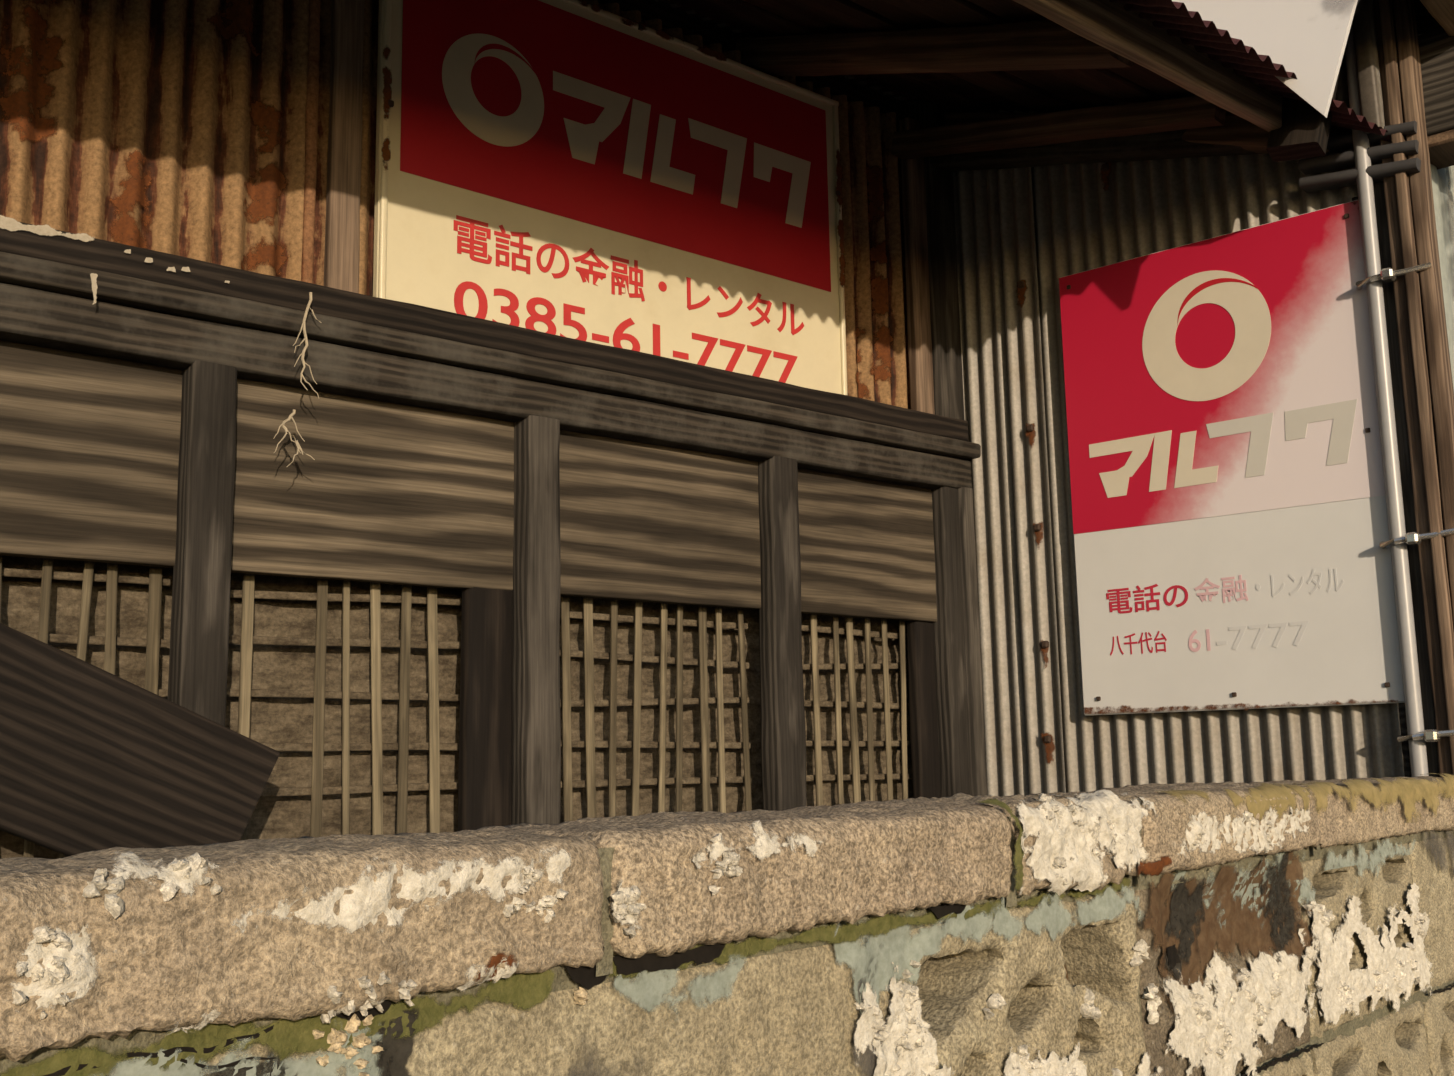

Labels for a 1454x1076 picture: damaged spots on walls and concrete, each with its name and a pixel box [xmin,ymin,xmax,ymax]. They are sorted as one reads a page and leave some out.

corrosion [0,0,75,142]
corrosion [241,97,290,275]
water stain [82,851,222,919]
water stain [233,848,571,933]
water stain [1016,790,1156,896]
water stain [1178,807,1311,857]
water stain [11,925,97,1020]
water stain [320,971,419,1076]
water stain [457,959,519,991]
water stain [853,960,951,1076]
water stain [1003,1043,1087,1076]
water stain [1112,883,1433,1076]